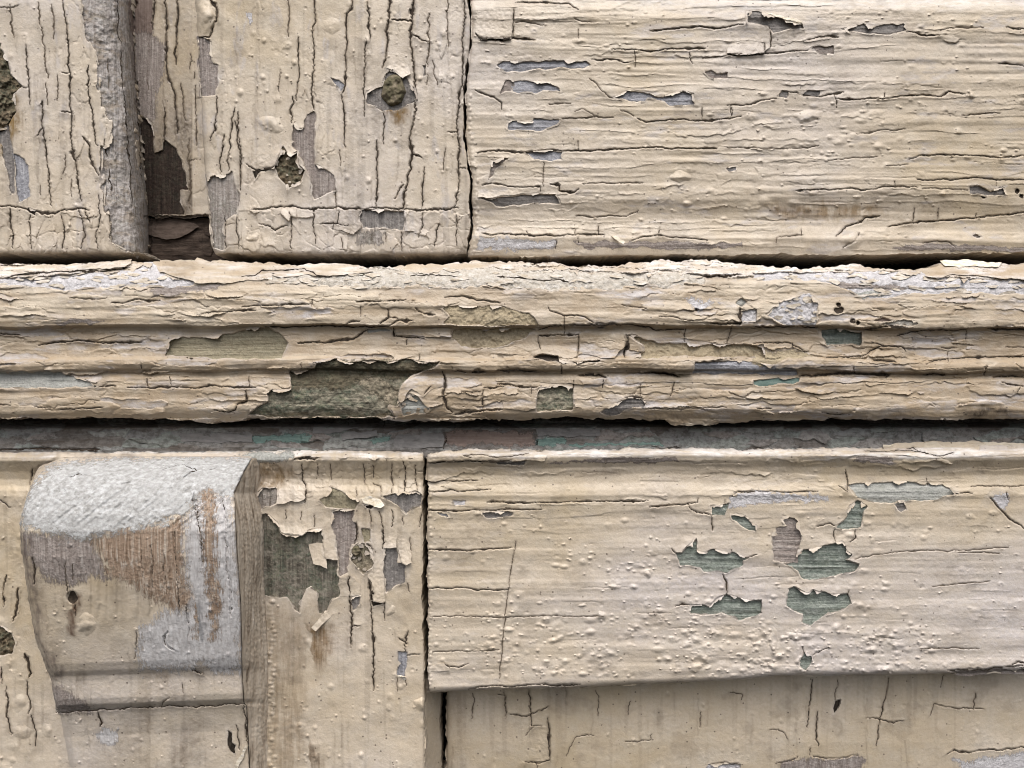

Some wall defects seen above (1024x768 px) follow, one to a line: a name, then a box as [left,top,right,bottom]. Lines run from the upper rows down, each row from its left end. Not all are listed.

peeling [0,0,743,312]
crack [0,0,1024,369]
crack [0,333,256,412]
peeling [736,259,1024,346]
peeling [19,305,960,680]
crack [347,577,604,768]
crack [770,678,898,763]
crack [948,746,1024,754]